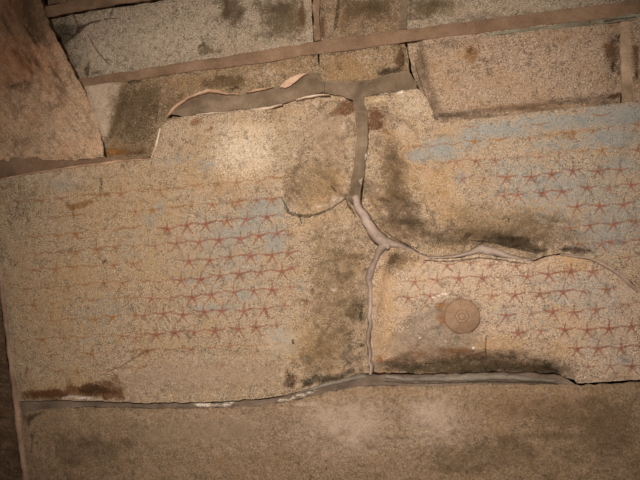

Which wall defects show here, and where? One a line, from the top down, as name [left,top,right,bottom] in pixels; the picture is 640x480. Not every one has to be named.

crack [282,186,356,224]
water stain [484,233,546,254]
rust [22,376,124,401]
water stain [302,370,353,387]
water stain [446,361,567,377]